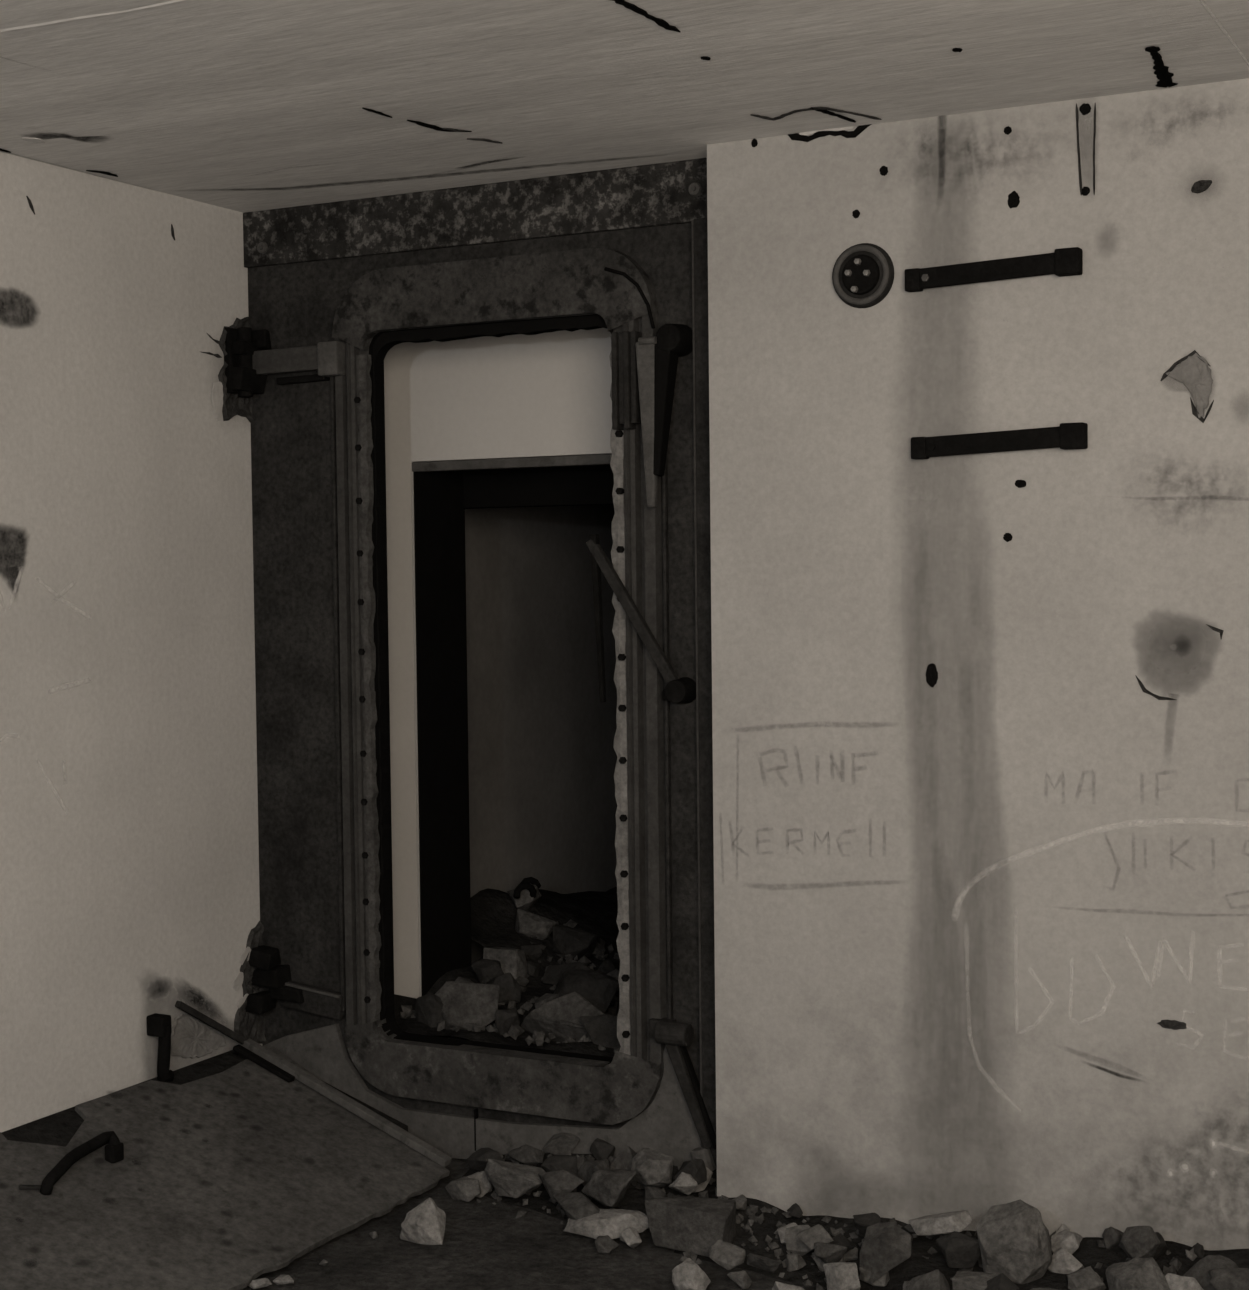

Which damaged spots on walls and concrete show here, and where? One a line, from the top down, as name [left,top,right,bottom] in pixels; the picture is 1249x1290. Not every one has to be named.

crack [612,0,680,32]
crack [1145,46,1178,88]
crack [362,108,511,168]
leakage [0,291,36,326]
peeling [1161,350,1214,423]
leakage [1135,675,1176,700]